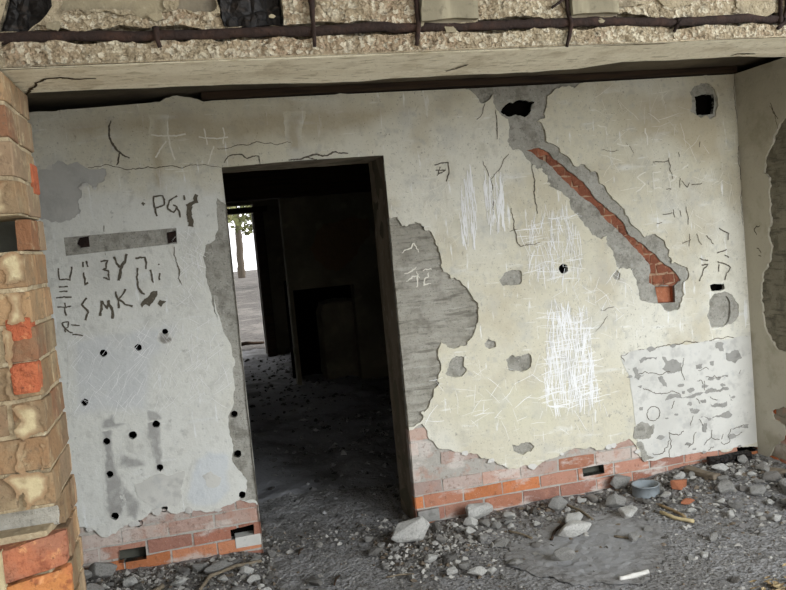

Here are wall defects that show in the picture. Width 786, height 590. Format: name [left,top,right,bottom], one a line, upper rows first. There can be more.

spalling [0,0,786,66]
peeling [38,160,106,223]
spalling [468,83,688,311]
spalling [762,118,786,352]
flaking render [0,199,264,590]
peeling [387,217,758,523]
flaking render [770,407,786,464]